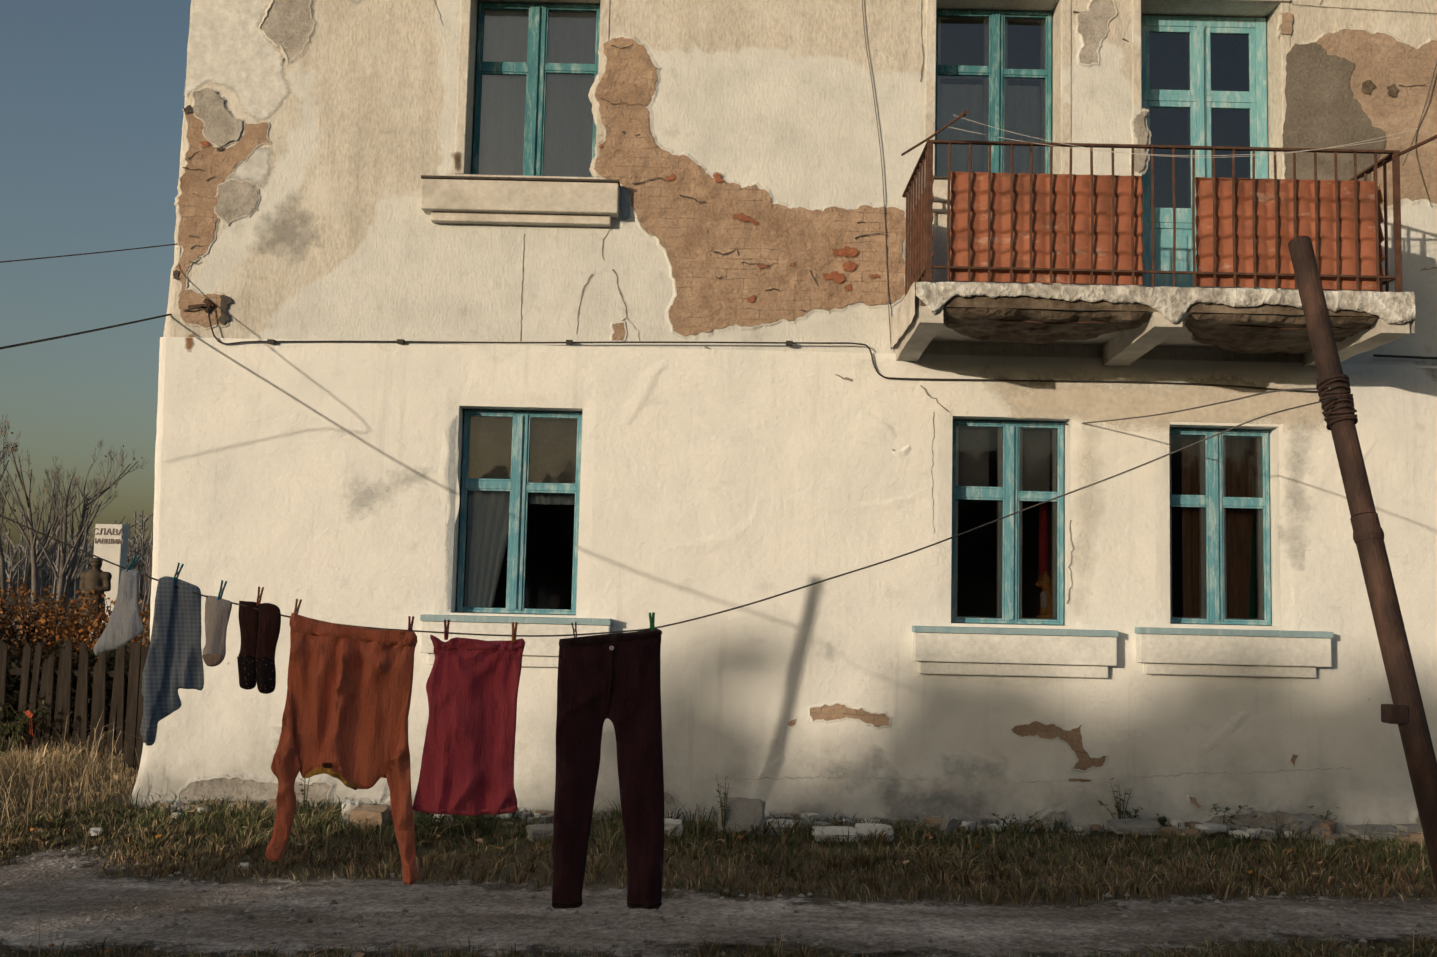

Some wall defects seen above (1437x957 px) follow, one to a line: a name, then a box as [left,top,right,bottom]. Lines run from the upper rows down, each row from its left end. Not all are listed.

flaking render [258,0,318,66]
flaking render [1075,0,1119,68]
flaking render [1276,12,1437,215]
flaking render [172,86,273,331]
flaking render [588,34,911,344]
spalling [943,308,1151,344]
spalling [1184,314,1312,355]
spalling [1330,316,1379,342]
flaking render [788,701,893,731]
flaking render [1009,718,1110,782]